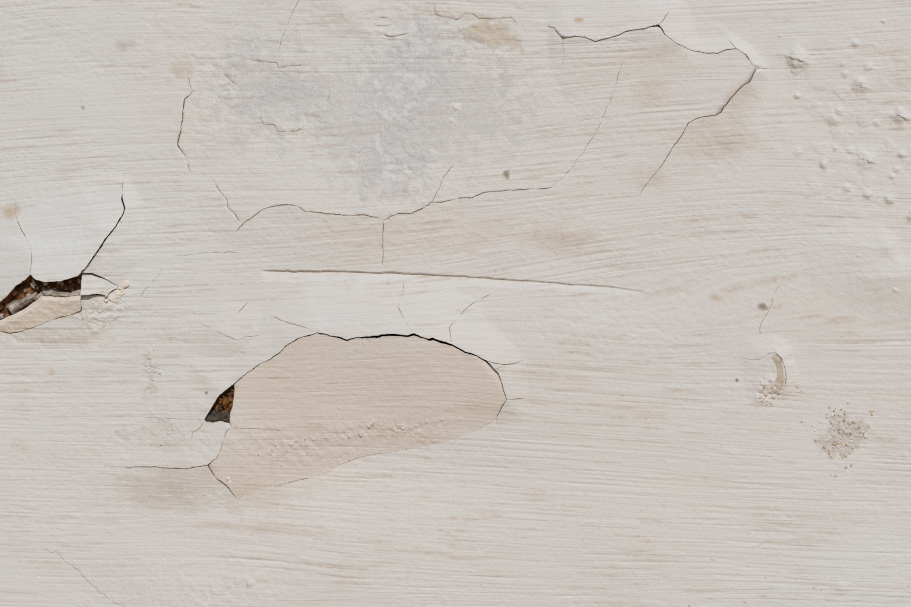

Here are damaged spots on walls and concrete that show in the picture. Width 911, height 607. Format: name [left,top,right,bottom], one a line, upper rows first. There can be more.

crack [176,70,193,170]